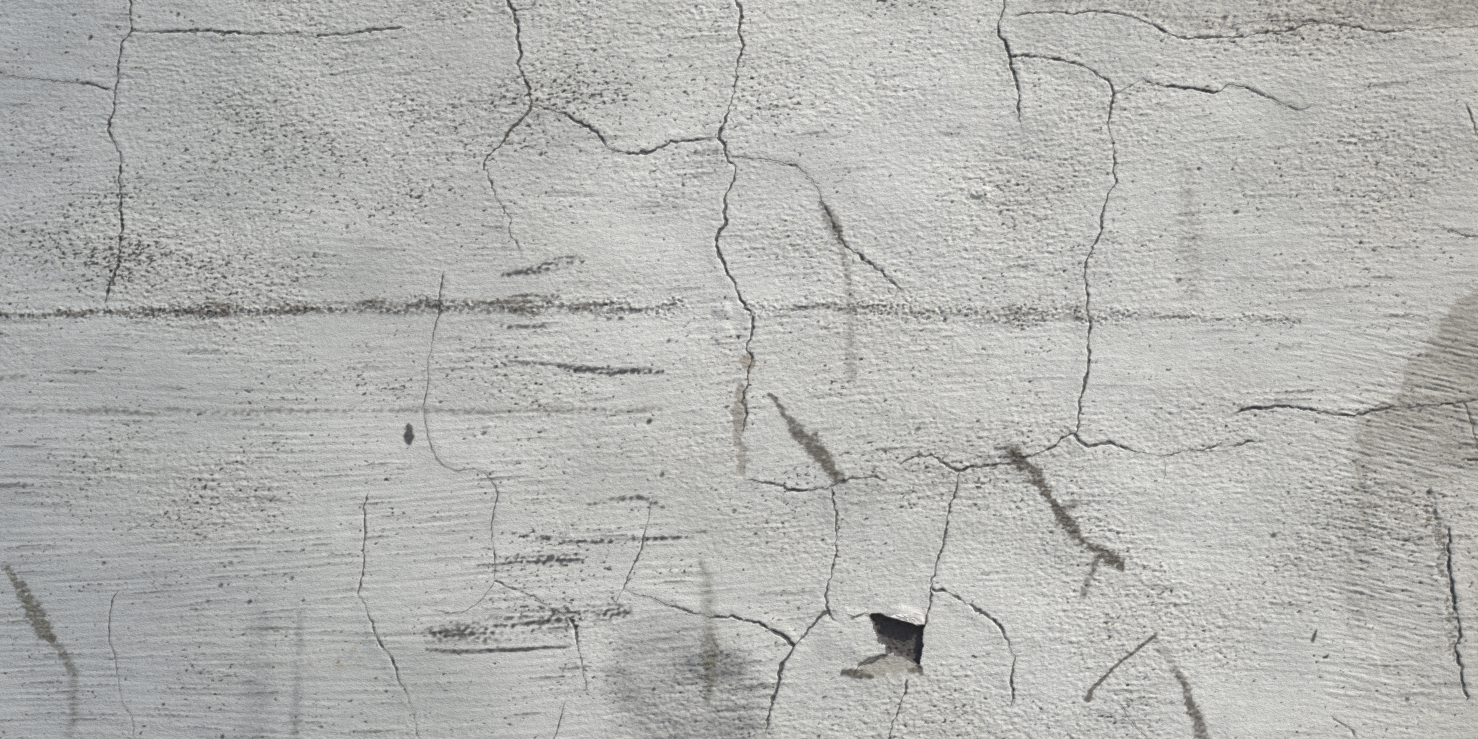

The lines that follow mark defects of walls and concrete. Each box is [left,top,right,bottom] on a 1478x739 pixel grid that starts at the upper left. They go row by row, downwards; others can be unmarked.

crack [0,0,405,303]
crack [483,0,904,431]
crack [108,592,135,735]
crack [358,494,420,739]
crack [424,271,589,739]
spalling [841,612,925,679]
crack [615,0,1478,739]